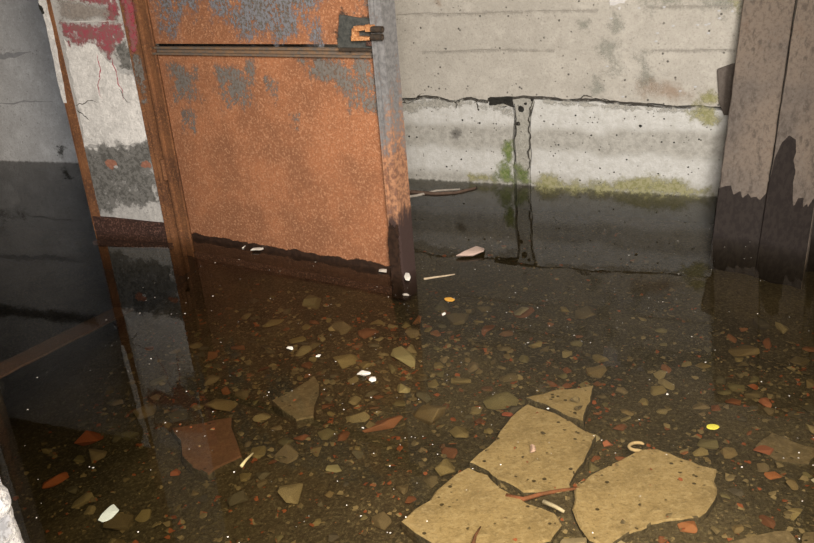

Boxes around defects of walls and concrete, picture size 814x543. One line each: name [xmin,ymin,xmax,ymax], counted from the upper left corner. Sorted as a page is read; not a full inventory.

peeling [38,0,147,170]
crack [402,95,491,110]
crack [512,95,705,175]